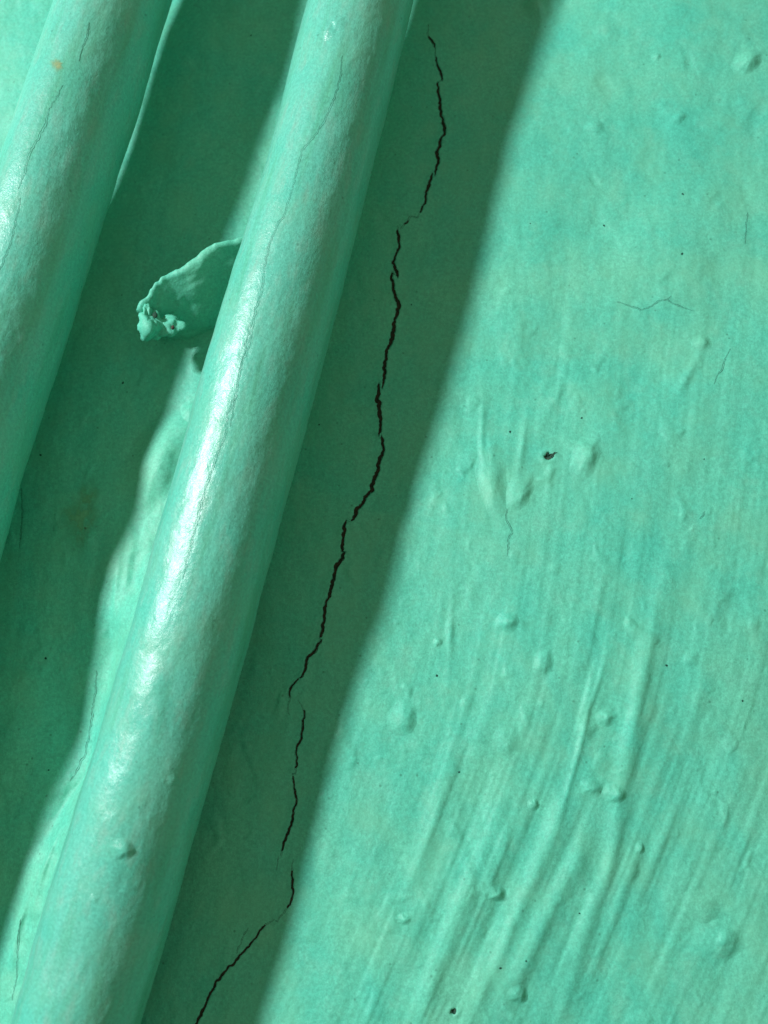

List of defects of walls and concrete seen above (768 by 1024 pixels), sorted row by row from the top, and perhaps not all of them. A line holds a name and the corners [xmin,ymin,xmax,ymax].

crack [183,25,446,1024]